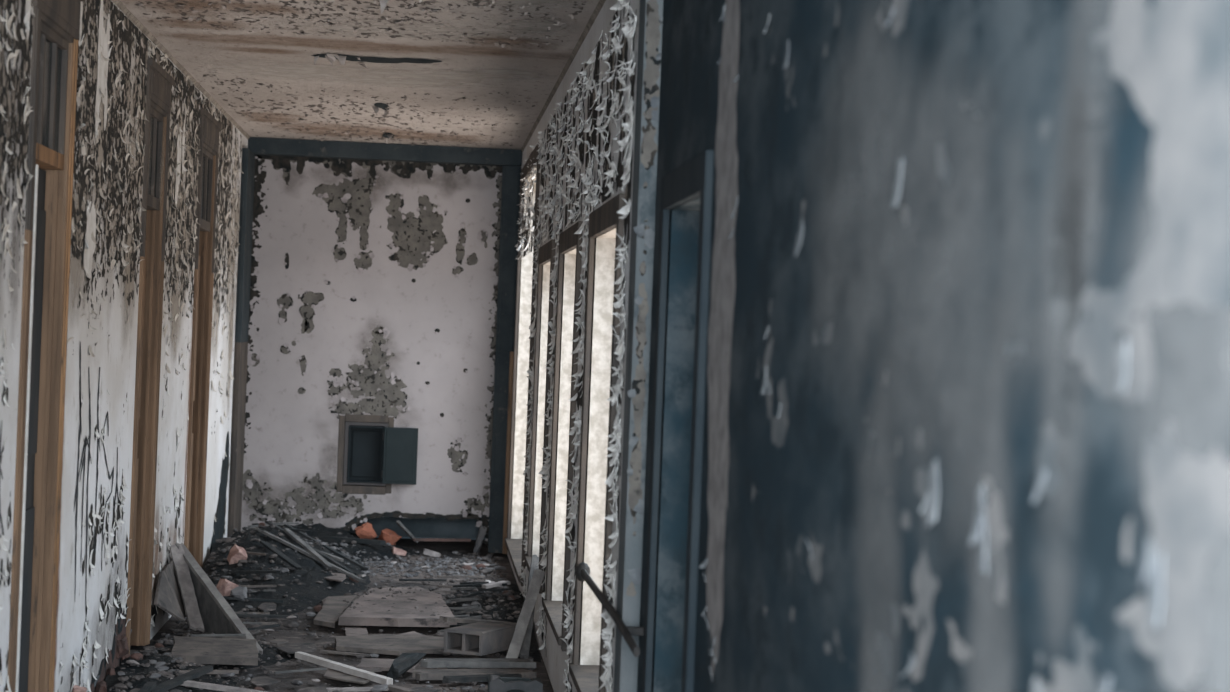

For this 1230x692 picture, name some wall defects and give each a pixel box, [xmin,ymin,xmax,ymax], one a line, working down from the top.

peeling [0,0,35,291]
peeling [0,311,17,407]
peeling [57,0,663,692]
crack [0,423,8,531]
crack [74,341,119,593]
peeling [0,491,12,586]
peeling [0,648,11,692]